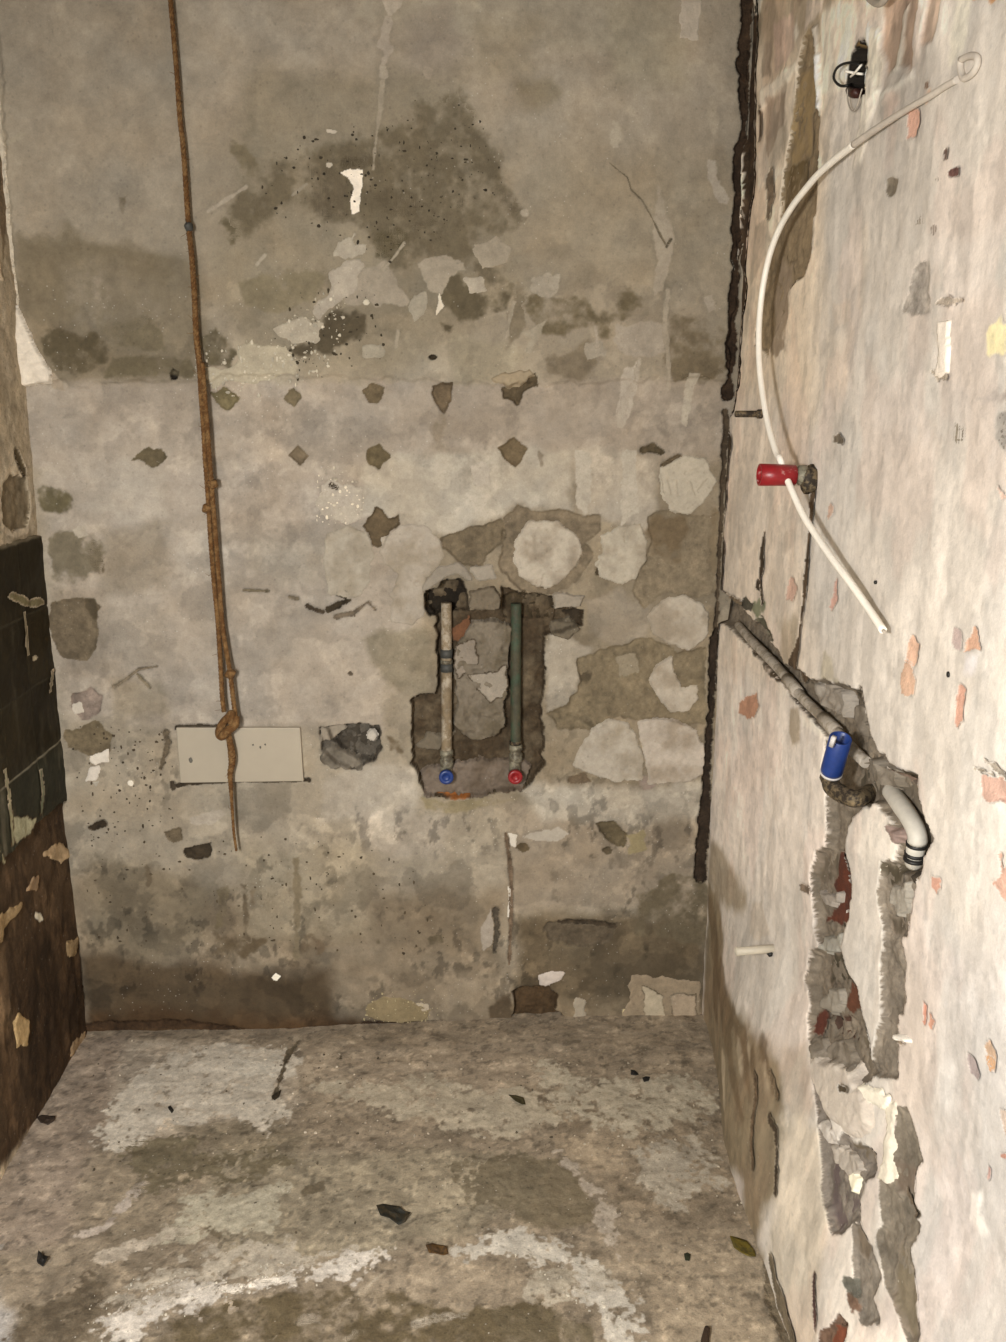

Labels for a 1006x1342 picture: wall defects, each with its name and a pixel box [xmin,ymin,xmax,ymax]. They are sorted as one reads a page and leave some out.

peeling [0,104,67,392]
water stain [13,82,651,397]
spalling [325,162,364,215]
water stain [660,311,728,386]
spalling [439,449,602,596]
spalling [619,448,716,609]
spalling [318,722,405,771]
spalling [546,637,708,731]
water stain [191,838,373,966]
water stain [631,871,708,949]
water stain [363,989,438,1023]
spalling [811,1081,923,1342]